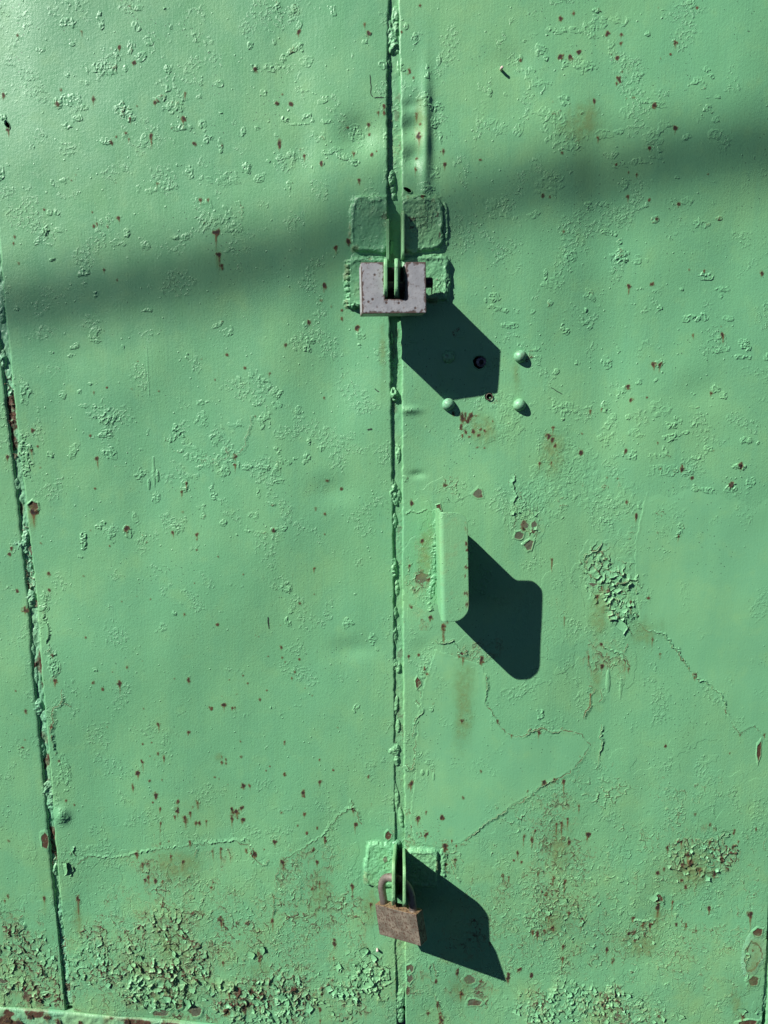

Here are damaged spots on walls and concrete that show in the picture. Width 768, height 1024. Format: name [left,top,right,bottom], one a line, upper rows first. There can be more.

corrosion [452,412,493,449]
peeling [509,479,551,557]
peeling [441,539,648,697]
crack [602,606,766,741]
crack [435,638,605,883]
crack [68,798,365,918]
peeling [0,737,768,1024]
corrosion [2,1014,60,1024]